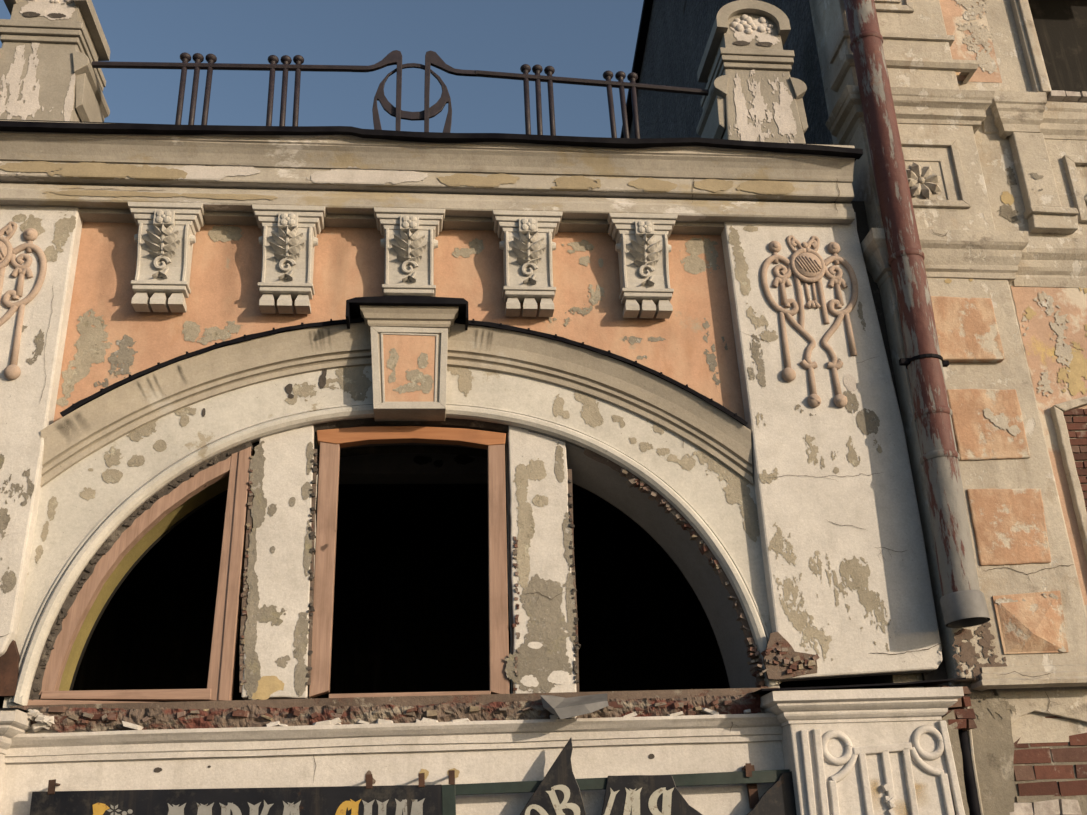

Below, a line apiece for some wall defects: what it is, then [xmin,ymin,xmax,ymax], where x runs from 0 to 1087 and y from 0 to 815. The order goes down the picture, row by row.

peeling [0,42,75,121]
peeling [729,69,797,143]
peeling [56,309,138,407]
peeling [284,366,372,405]
peeling [803,358,895,474]
peeling [1022,291,1087,396]
peeling [0,454,34,541]
peeling [0,557,17,594]
flaking render [22,391,891,733]
flaking render [939,622,1016,815]